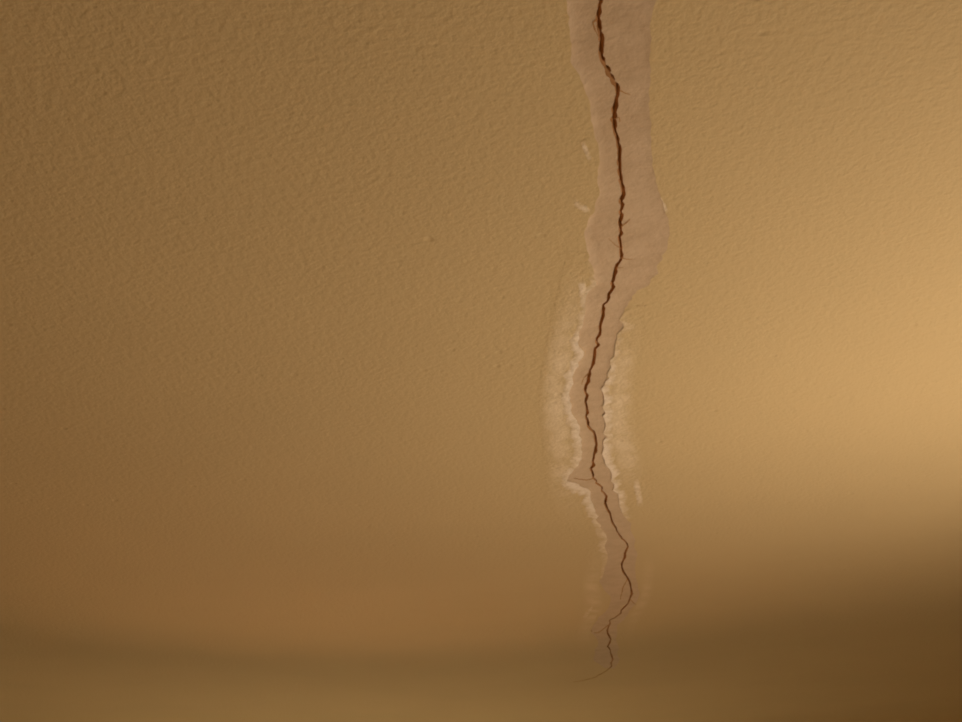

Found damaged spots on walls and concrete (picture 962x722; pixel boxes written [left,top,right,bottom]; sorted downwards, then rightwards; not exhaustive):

peeling [539,0,670,669]
crack [574,0,635,682]